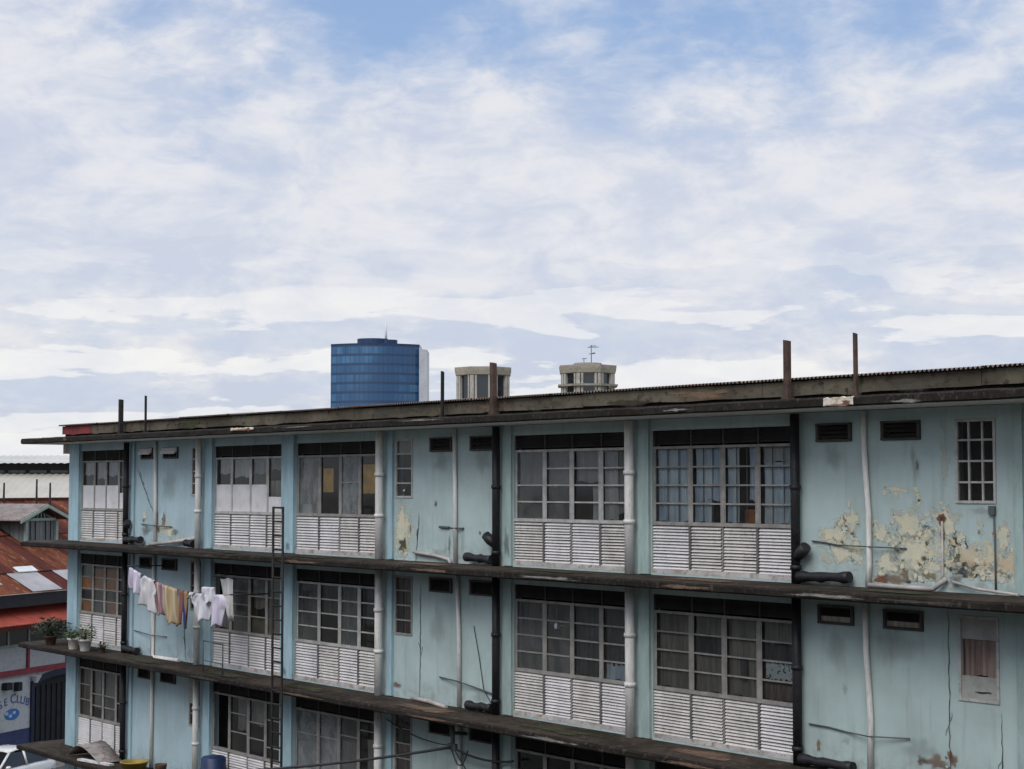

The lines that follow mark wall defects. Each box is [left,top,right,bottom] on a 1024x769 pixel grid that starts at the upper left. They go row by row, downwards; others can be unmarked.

peeling [394,489,415,575]
peeling [818,486,1015,589]
crack [944,619,952,769]